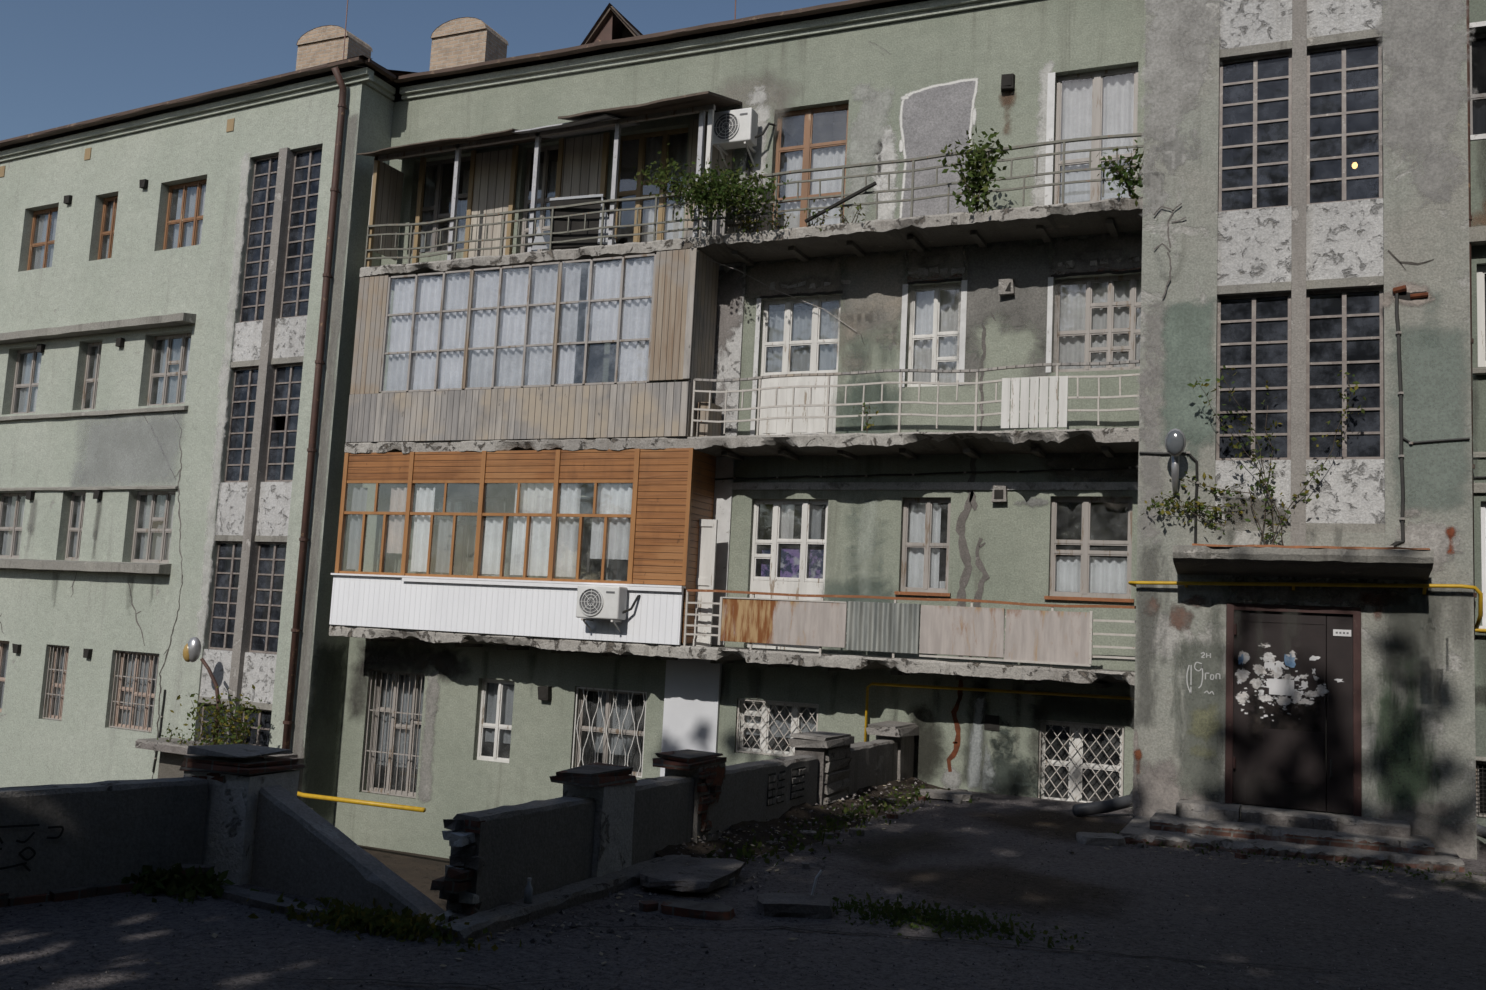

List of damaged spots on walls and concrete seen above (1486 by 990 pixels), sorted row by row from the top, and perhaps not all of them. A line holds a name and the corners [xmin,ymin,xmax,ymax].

peeling [846,84,909,223]
peeling [1032,62,1053,206]
peeling [713,232,1142,409]
crack [955,315,996,607]
crack [128,413,183,779]